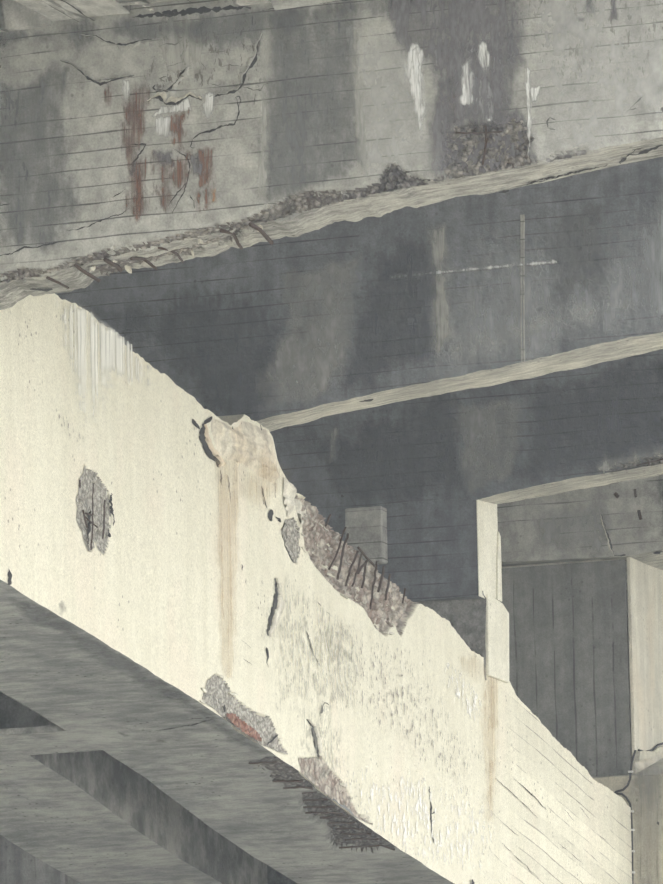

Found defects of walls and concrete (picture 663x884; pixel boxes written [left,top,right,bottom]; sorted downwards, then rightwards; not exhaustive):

crack [43,0,274,213]
corrosion [122,89,215,220]
spalling [0,118,535,289]
leakage [388,0,540,176]
spalling [76,466,115,555]
crack [192,416,231,500]
crack [261,486,281,522]
spalling [281,495,417,635]
spalling [605,455,663,471]
spalling [199,674,492,865]